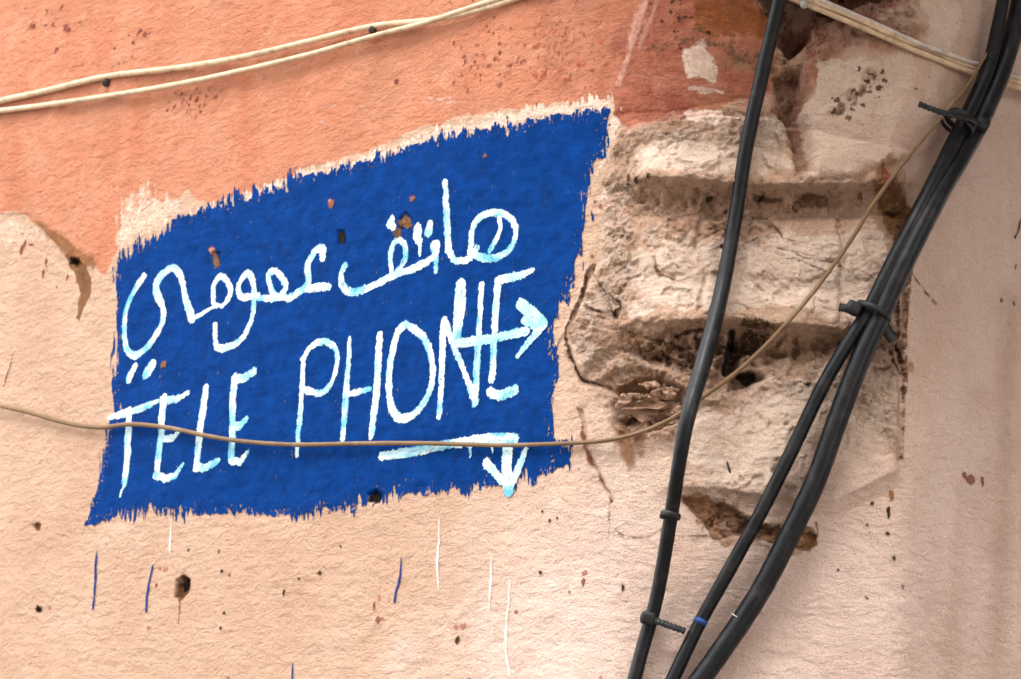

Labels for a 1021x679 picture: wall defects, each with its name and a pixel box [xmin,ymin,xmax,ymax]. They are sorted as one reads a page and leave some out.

peeling [463,16,608,87]
flaking render [568,0,748,465]
flaking render [681,0,925,539]
crack [557,262,675,389]
crack [577,408,613,503]
flaking render [756,523,781,542]
flaking render [795,522,818,550]